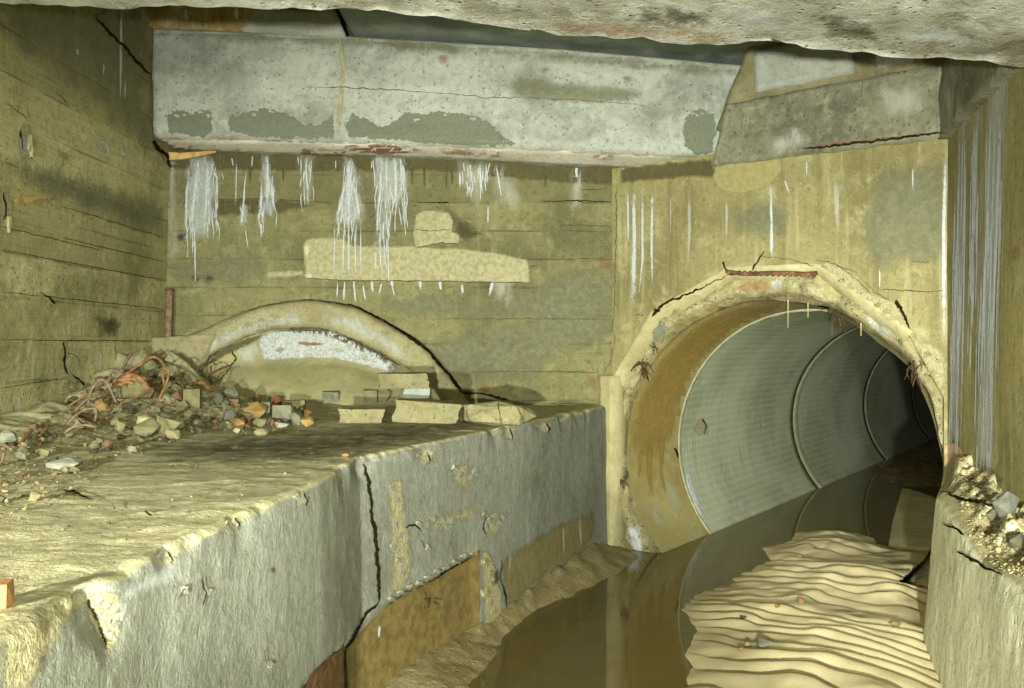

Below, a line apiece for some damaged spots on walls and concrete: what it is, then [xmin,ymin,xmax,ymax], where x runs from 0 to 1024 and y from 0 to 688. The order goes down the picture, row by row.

crack [95,10,151,75]
peeling [166,109,213,138]
peeling [228,108,515,147]
peeling [683,108,717,155]
crack [802,132,946,149]
leakage [161,139,714,311]
leakage [741,188,787,253]
crack [234,185,944,423]
leakage [869,84,1007,476]
spalling [959,470,1024,578]
crack [344,464,381,688]